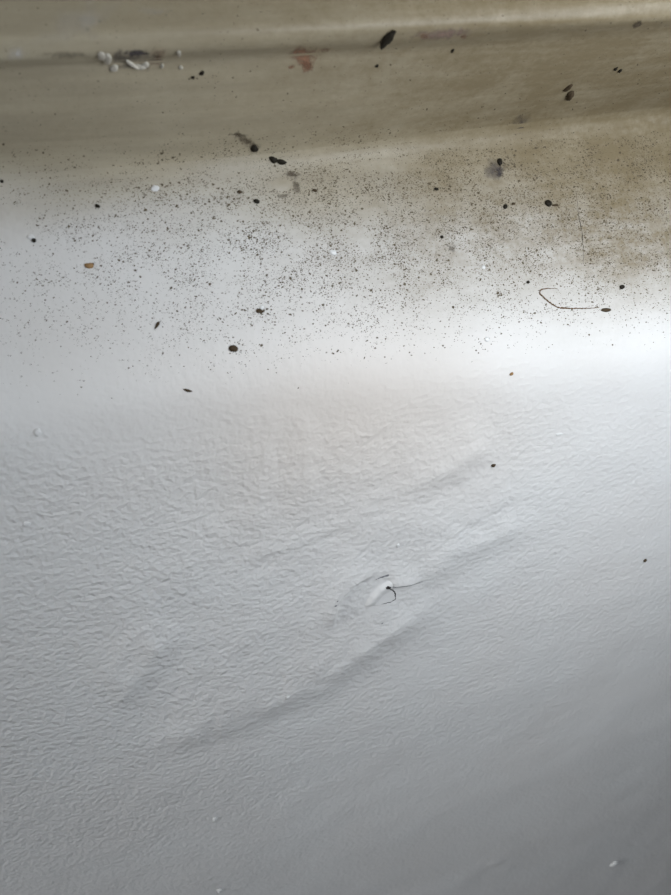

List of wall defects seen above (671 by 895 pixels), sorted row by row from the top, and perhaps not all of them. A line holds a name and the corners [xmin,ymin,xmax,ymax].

leakage [0,100,671,381]